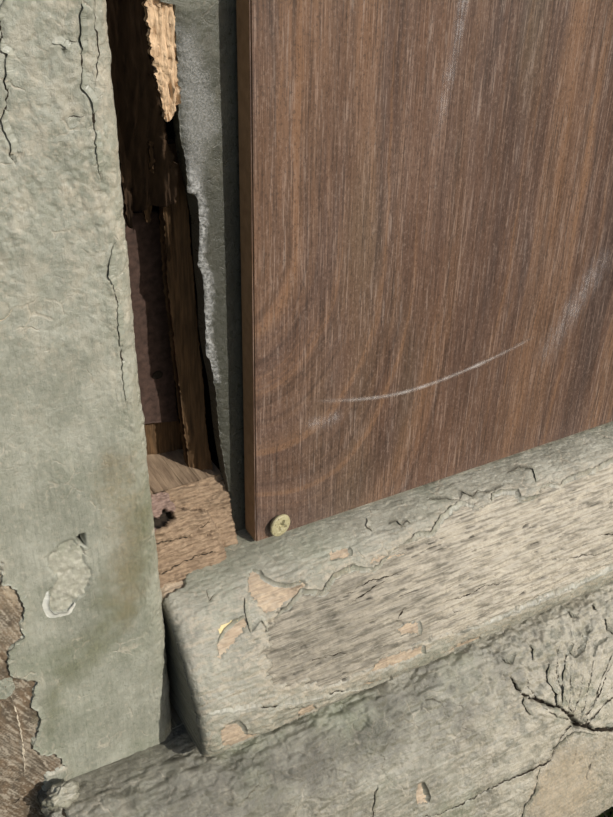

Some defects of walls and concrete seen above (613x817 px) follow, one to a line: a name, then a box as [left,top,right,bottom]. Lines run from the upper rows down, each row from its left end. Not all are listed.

crack [0,0,18,164]
crack [51,3,104,178]
peeling [0,561,67,817]
peeling [42,534,91,618]
peeling [160,579,184,602]
peeling [217,615,248,659]
peeling [220,720,257,746]
crack [373,786,381,817]
peeling [248,457,613,687]
crack [426,603,613,817]